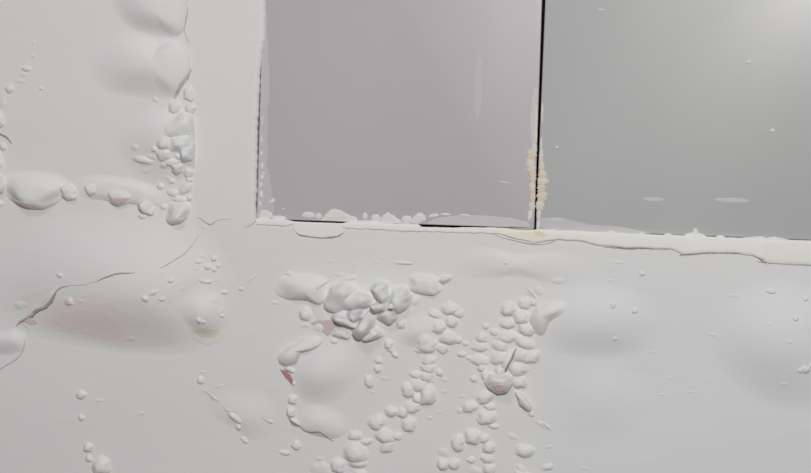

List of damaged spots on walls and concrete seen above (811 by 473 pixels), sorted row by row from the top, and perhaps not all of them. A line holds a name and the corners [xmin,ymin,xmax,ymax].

crack [160,217,223,268]
crack [0,273,131,369]
leakage [19,287,225,349]